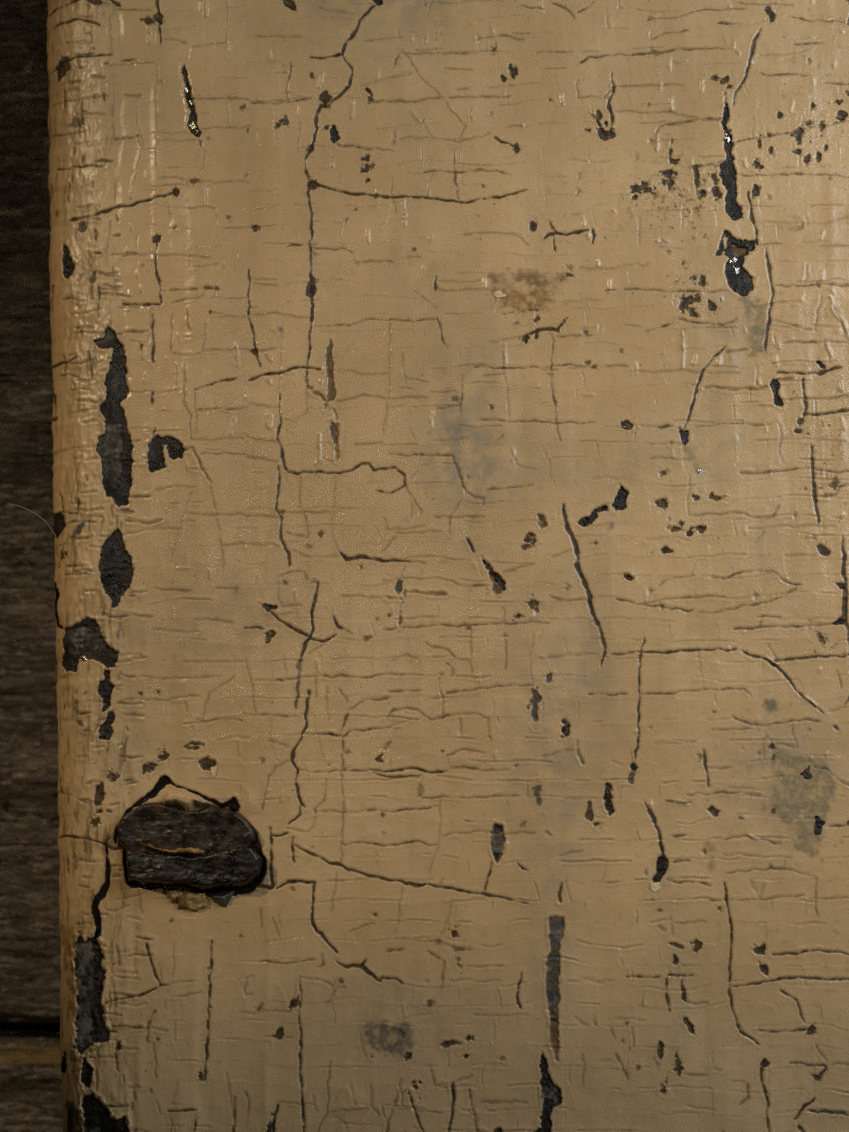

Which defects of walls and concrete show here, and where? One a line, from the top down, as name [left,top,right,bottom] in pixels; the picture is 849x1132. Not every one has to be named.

crack [735,0,849,93]
crack [202,6,525,565]
peeling [692,103,756,296]
peeling [94,327,133,506]
peeling [98,529,133,607]
peeling [147,430,186,472]
crack [562,173,849,784]
peeling [62,618,118,739]
peeling [61,925,128,1132]
rust [140,843,205,856]
crack [60,582,524,984]
crack [648,752,846,1129]